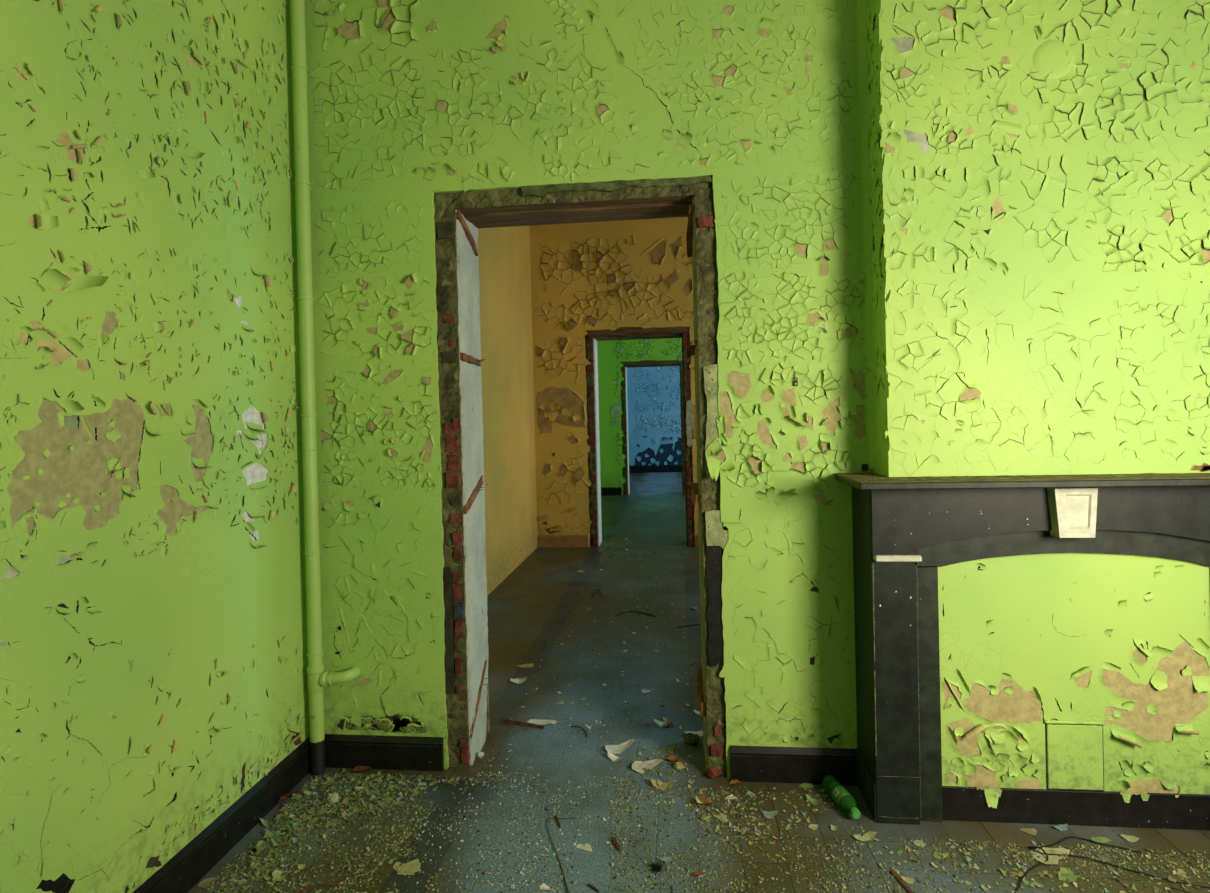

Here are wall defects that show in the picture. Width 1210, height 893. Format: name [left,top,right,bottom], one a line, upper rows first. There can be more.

crack [581,0,702,155]
crack [1,192,111,232]
peeling [0,0,300,584]
peeling [308,0,1210,776]
crack [741,600,785,674]
peeling [940,654,1074,808]
peeling [1071,634,1210,803]
peeling [197,768,460,893]
peeling [608,746,1210,893]